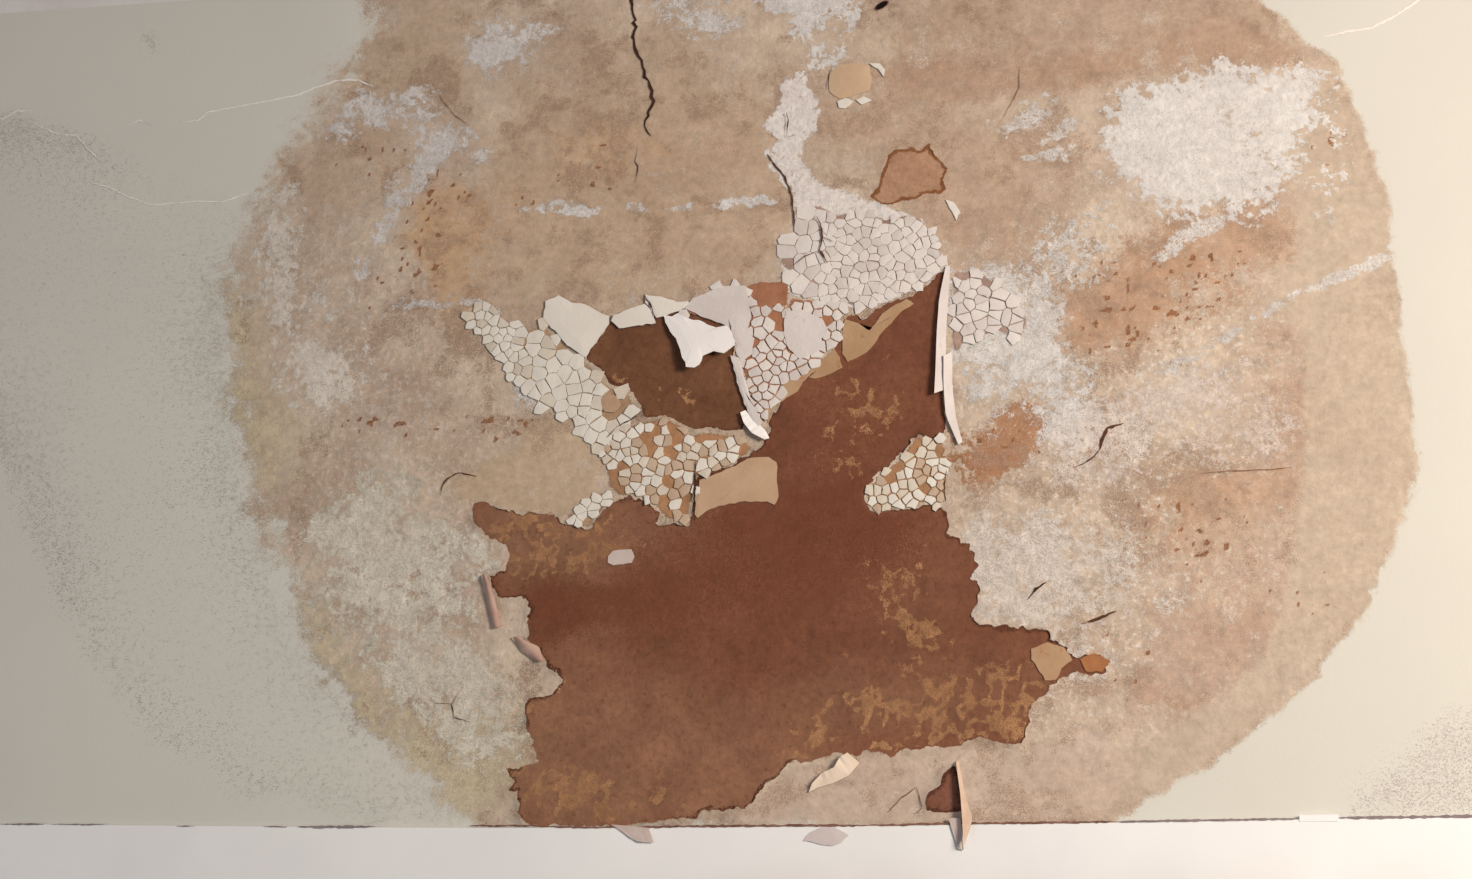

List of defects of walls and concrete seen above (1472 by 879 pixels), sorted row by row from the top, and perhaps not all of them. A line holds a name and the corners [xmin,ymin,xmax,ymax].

crack [630,0,655,182]
peeling [870,143,950,205]
water stain [834,288,917,334]
water stain [545,326,619,390]
water stain [612,391,780,468]
water stain [888,434,923,469]
peeling [472,272,1110,827]
peeling [925,766,964,850]